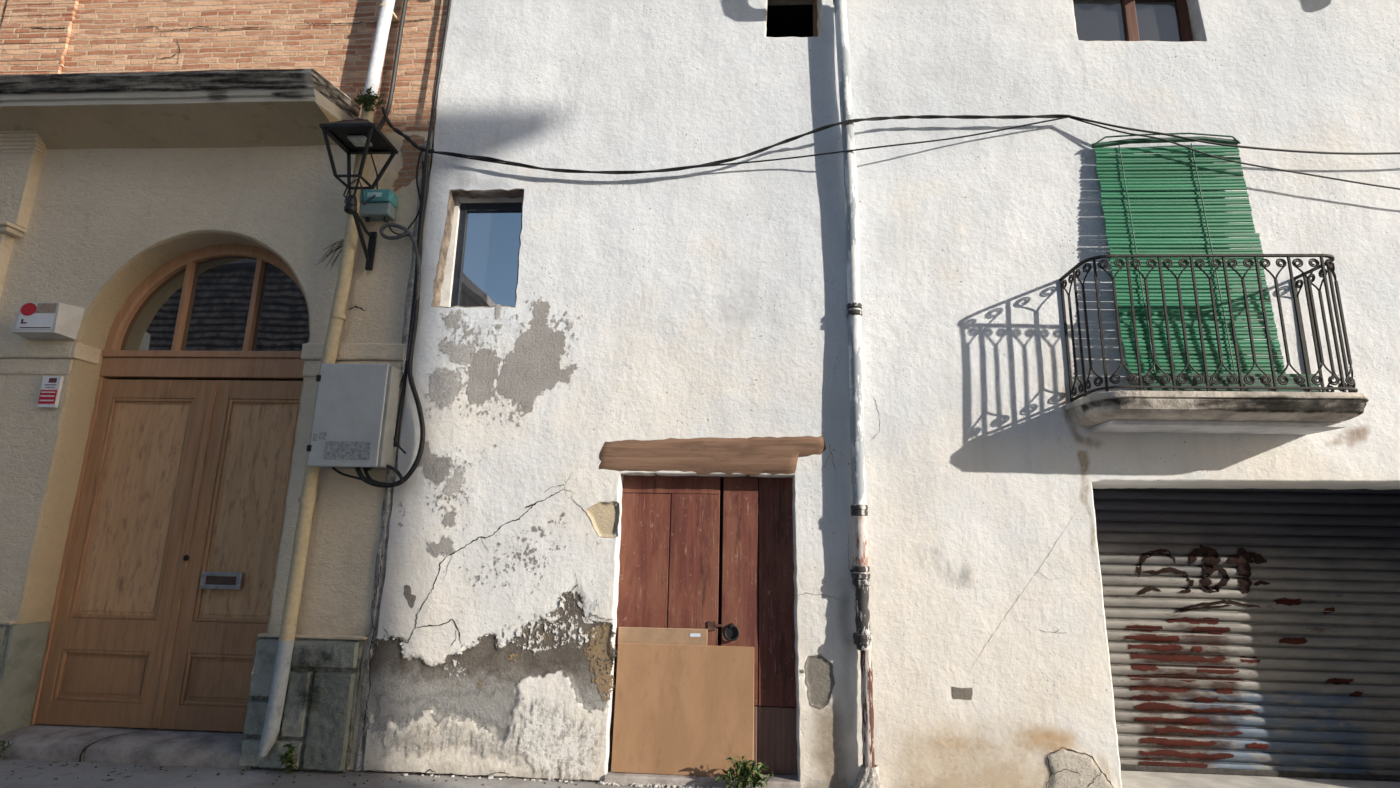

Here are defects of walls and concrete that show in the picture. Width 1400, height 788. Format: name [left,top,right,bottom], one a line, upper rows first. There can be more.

mould [0,69,360,118]
peeling [425,297,580,426]
peeling [417,440,577,600]
spalling [585,501,620,546]
crack [361,474,600,782]
spalling [360,577,618,745]
spalling [800,655,835,709]